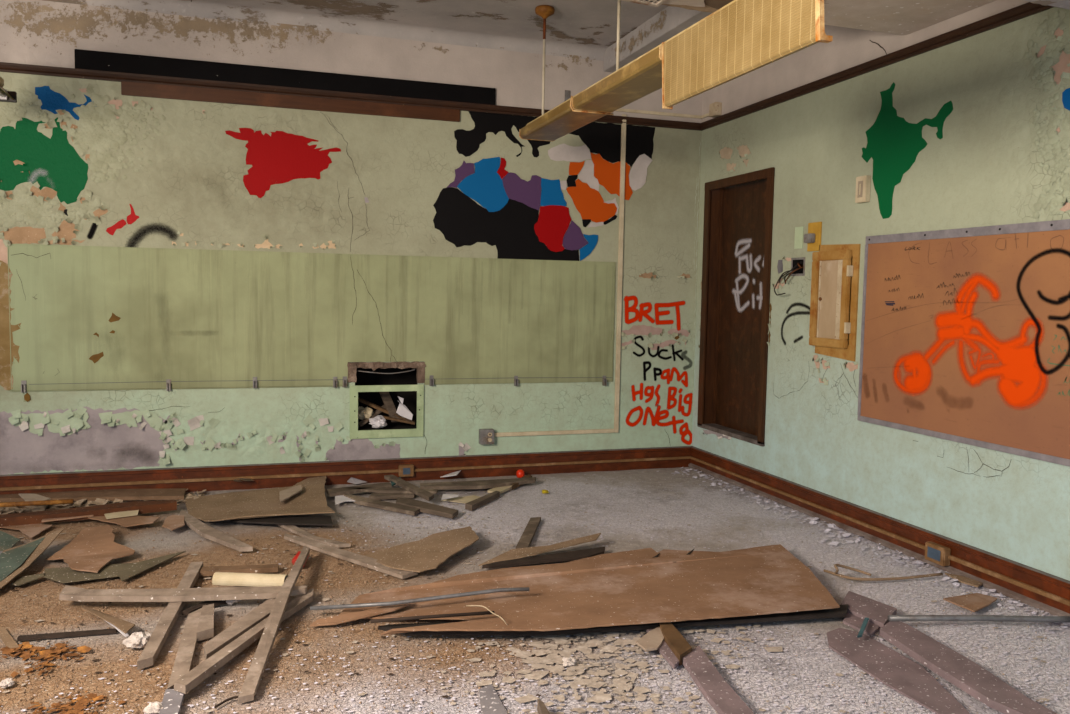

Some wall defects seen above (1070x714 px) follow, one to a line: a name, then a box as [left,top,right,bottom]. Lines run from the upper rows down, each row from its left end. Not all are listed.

peeling [0,0,399,62]
peeling [40,110,78,141]
peeling [0,160,109,391]
crack [322,113,396,362]
peeling [0,393,400,475]